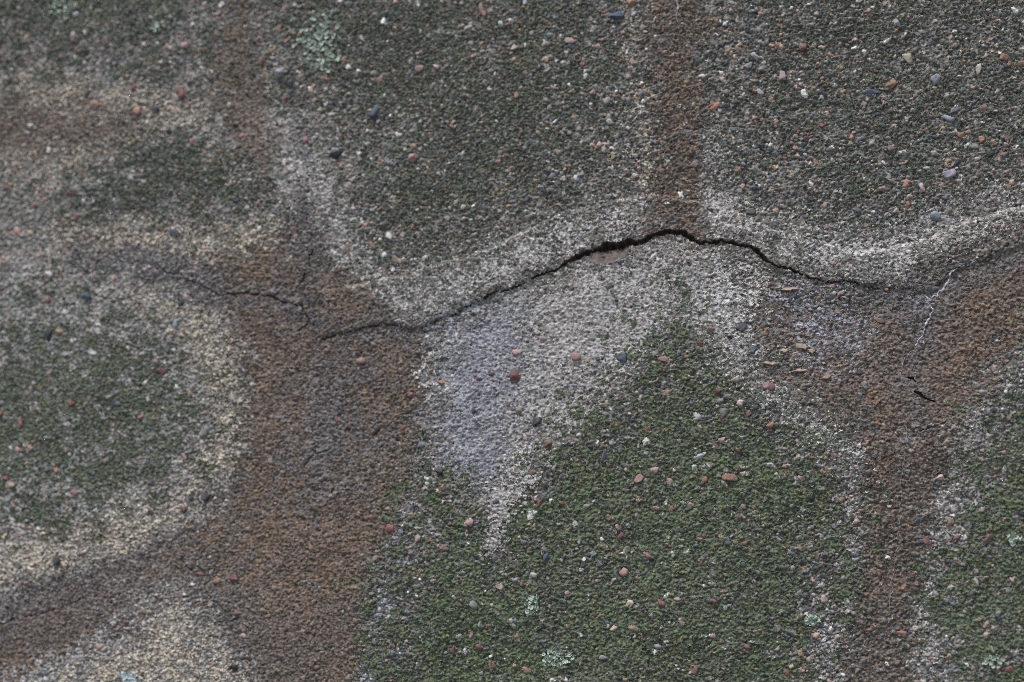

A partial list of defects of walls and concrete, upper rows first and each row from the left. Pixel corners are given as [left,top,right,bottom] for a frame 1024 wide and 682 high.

crack [154,214,1022,635]